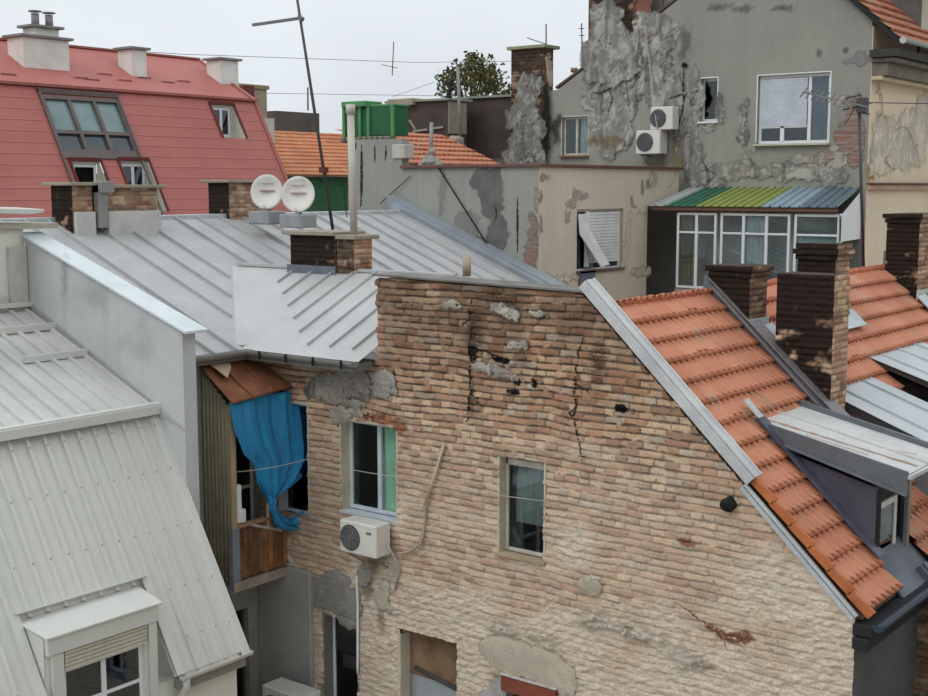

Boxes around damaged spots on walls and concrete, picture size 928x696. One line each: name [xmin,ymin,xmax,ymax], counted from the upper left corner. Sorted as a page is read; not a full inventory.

flaking render [579,0,928,188]
damp [455,160,509,250]
flaking render [565,188,588,222]
peeling [441,299,462,310]
peeling [468,340,529,364]